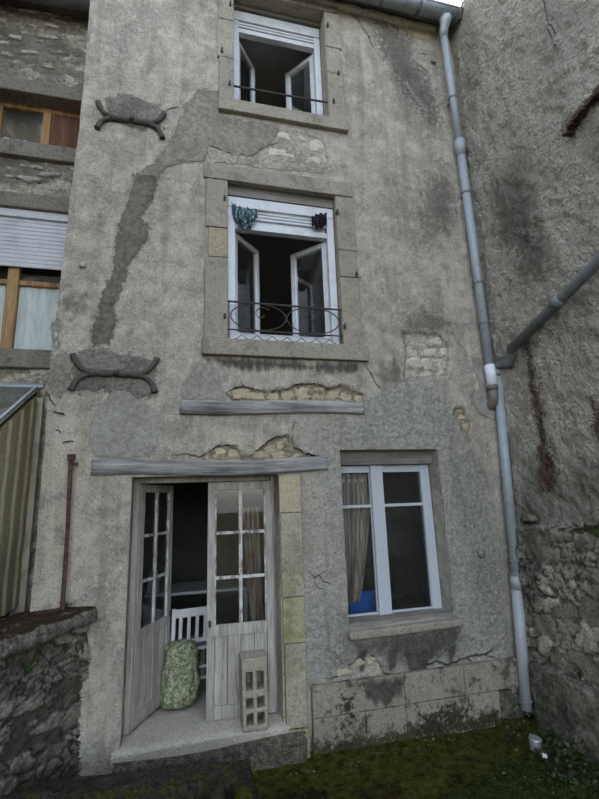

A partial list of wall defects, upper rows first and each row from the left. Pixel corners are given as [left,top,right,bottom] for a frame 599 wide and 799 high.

spalling [207,131,331,174]
spalling [403,332,450,378]
spalling [231,384,363,402]
corrosion [523,339,560,494]
spalling [209,436,309,460]
crack [308,571,332,590]
spalling [334,655,383,678]
crack [326,631,508,679]
water stain [336,649,434,730]
mould [415,699,474,733]